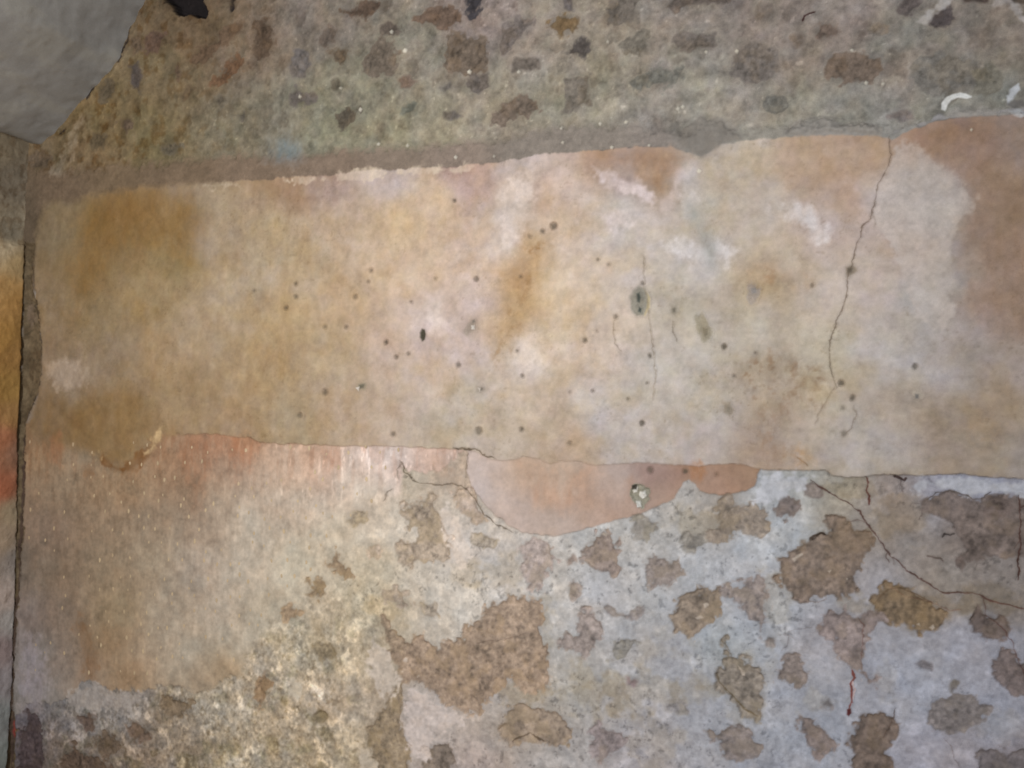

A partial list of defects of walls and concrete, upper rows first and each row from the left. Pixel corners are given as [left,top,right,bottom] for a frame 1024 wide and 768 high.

water stain [56,180,243,340]
water stain [589,140,744,275]
water stain [761,196,836,248]
crack [814,135,893,434]
water stain [43,353,95,398]
crack [382,446,514,533]
crack [796,456,1024,677]
spalling [917,490,1024,575]
spalling [355,480,950,768]
spalling [967,601,1024,700]
spalling [16,705,154,768]
spalling [926,677,995,738]